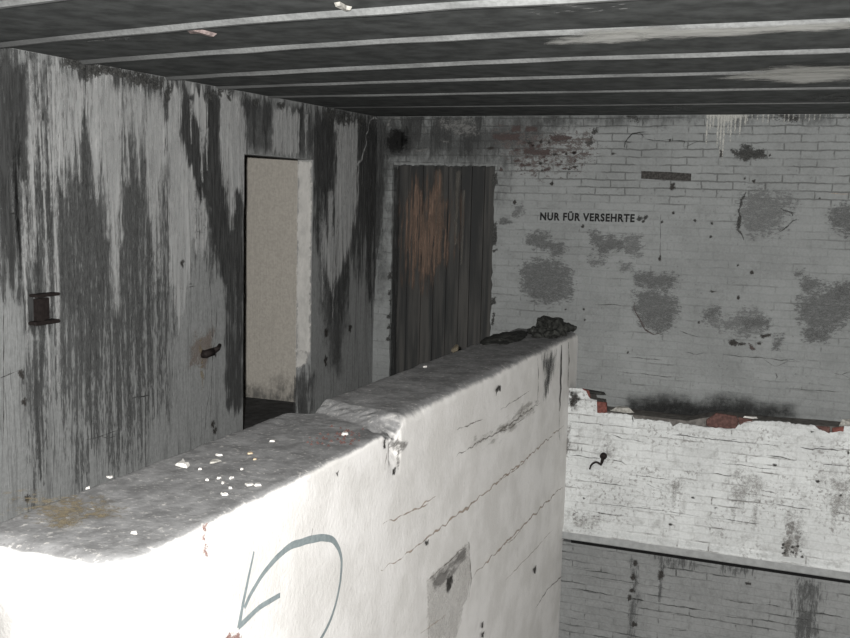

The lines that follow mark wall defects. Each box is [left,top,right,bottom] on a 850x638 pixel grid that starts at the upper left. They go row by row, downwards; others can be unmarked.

damp [0,55,388,466]
rust [398,171,455,294]
crack [381,342,570,572]
flaking render [582,388,607,413]
flaking render [706,413,752,429]